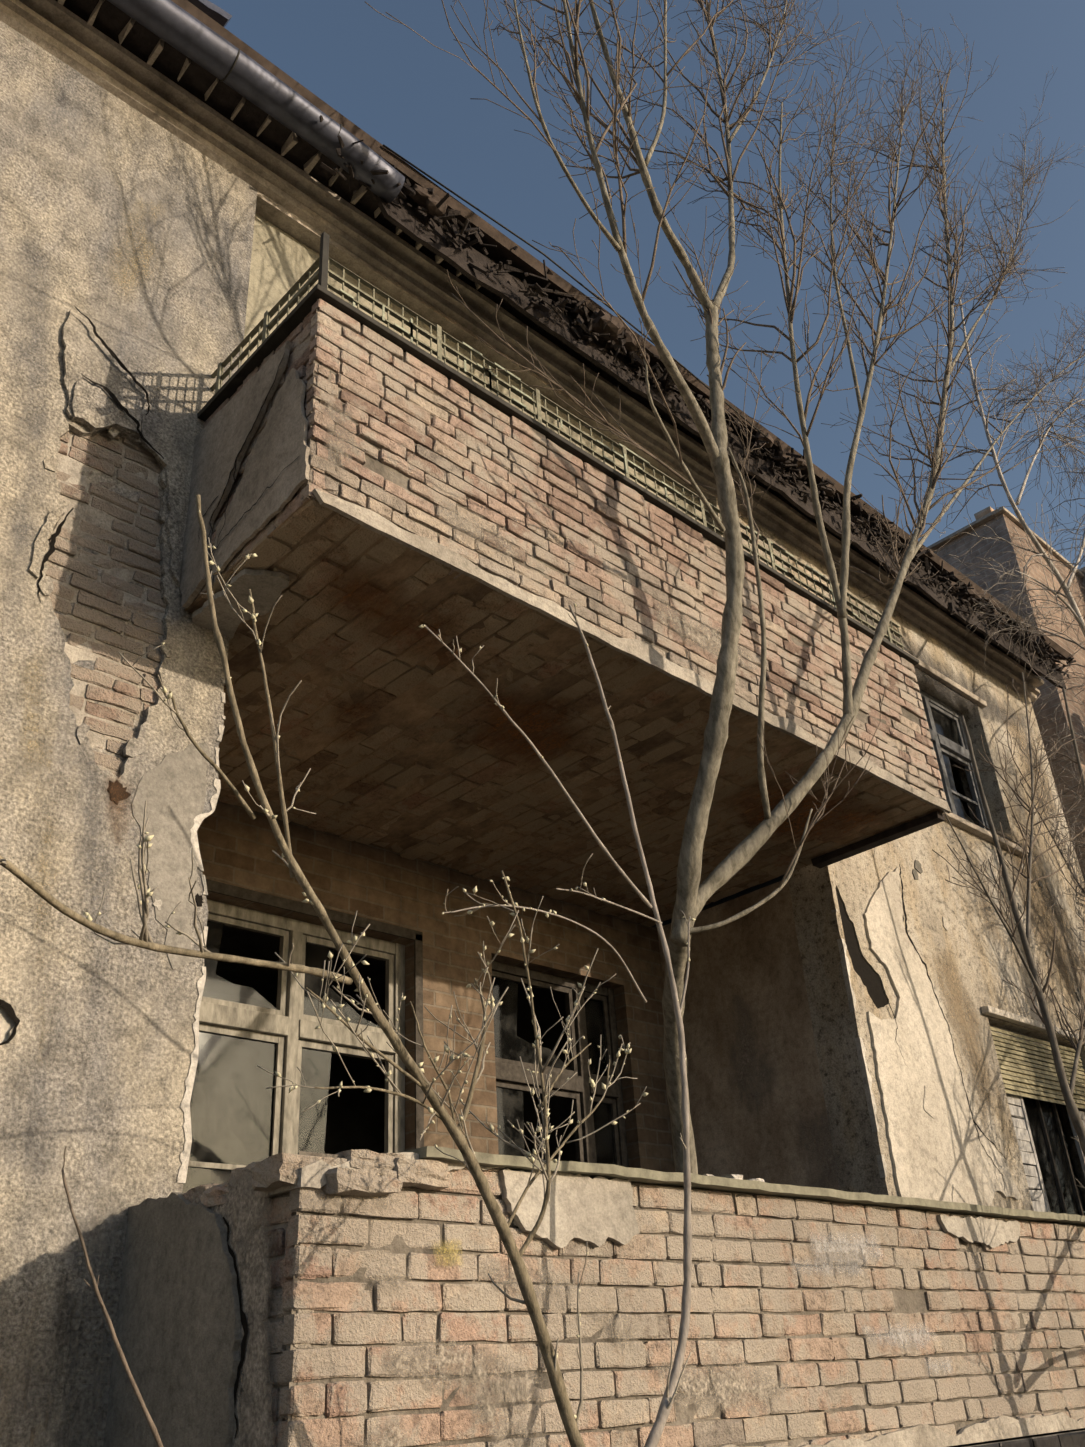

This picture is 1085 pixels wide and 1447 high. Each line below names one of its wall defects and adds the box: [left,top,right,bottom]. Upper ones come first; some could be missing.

spalling [38,427,174,805]
crack [180,340,310,608]
spalling [0,999,20,1045]
flaking render [837,860,1023,1248]
crack [899,864,1008,1198]